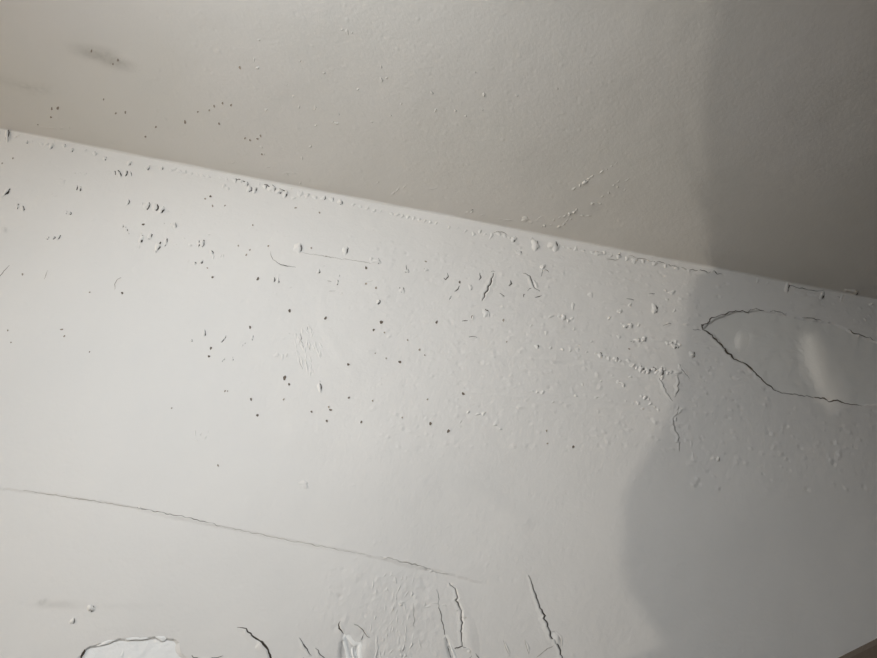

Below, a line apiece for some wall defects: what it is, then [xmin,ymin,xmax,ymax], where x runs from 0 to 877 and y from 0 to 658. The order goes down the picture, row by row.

flaking render [121,223,211,253]
crack [24,490,480,658]
peeling [76,634,189,658]
crack [527,575,563,658]